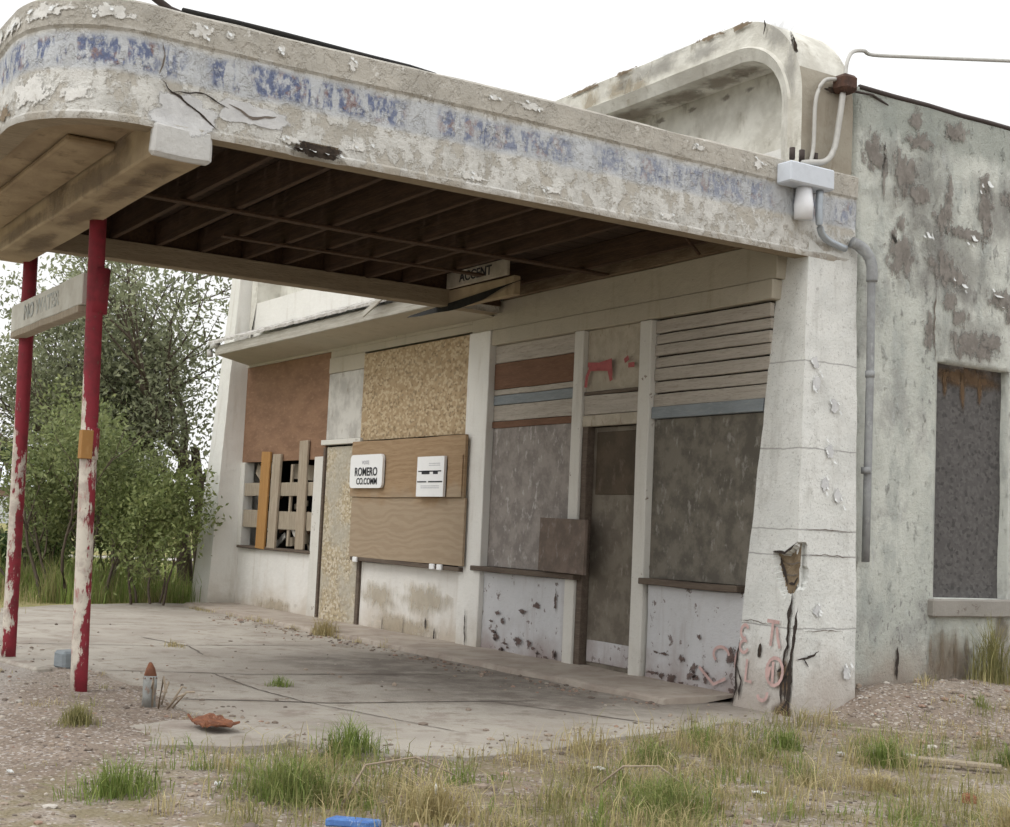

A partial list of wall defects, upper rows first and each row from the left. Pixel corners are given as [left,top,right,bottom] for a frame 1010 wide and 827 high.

peeling [0,1,137,44]
peeling [0,71,99,122]
crack [159,45,276,129]
peeling [148,91,375,161]
peeling [488,93,544,112]
peeling [861,105,1010,363]
rust [937,366,994,407]
peeling [489,610,556,659]
peeling [648,654,709,684]
crack [732,591,842,716]